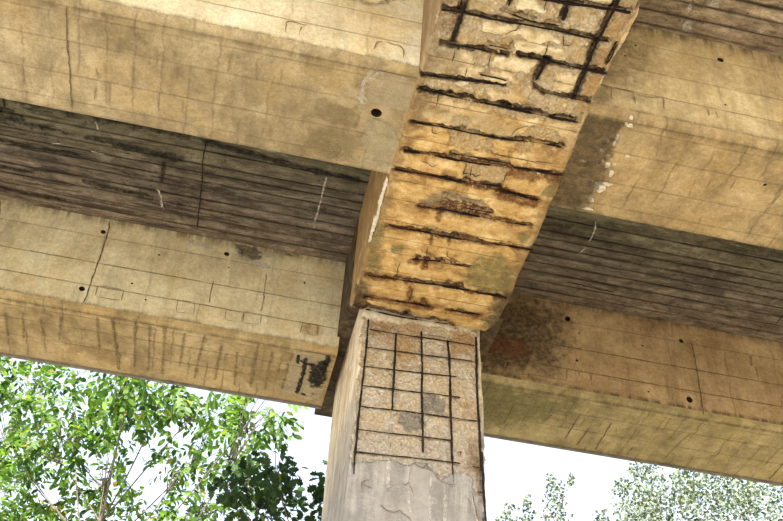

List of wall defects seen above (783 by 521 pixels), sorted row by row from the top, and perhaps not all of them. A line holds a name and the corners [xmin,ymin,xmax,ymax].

crack [65,6,73,108]
rust [416,70,576,121]
spalling [421,0,640,189]
rust [439,0,627,104]
crack [83,222,124,303]
peeling [368,176,388,242]
rust [384,200,533,251]
rust [392,166,540,208]
spalling [439,191,493,220]
damp [550,115,625,210]
spalling [350,302,486,521]
crack [565,414,632,454]